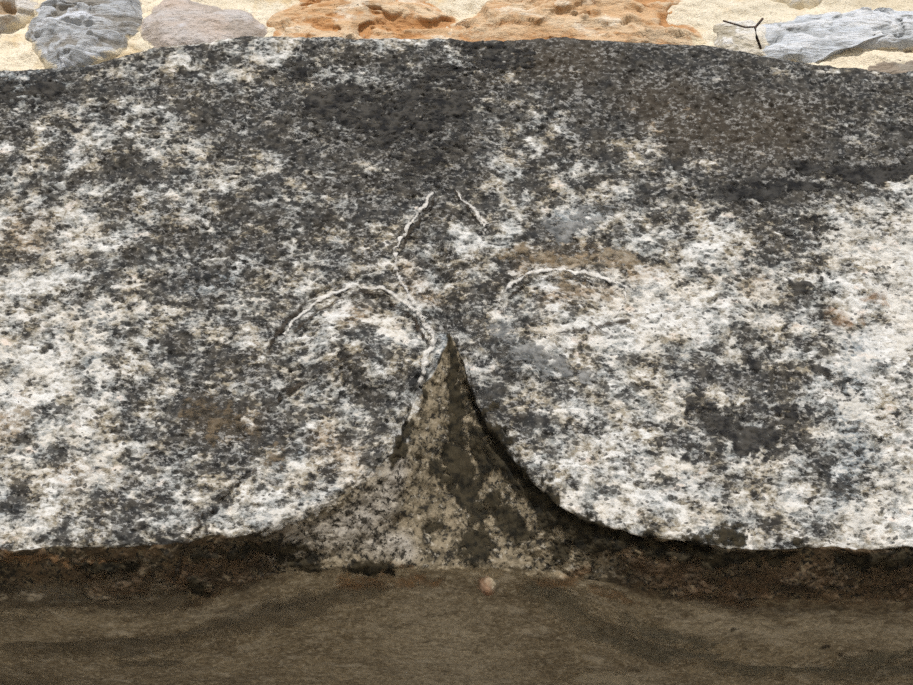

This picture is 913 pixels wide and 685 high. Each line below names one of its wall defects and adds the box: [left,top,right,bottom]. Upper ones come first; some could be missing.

crack [266,290,324,353]
crack [540,319,627,337]
spalling [231,490,307,534]